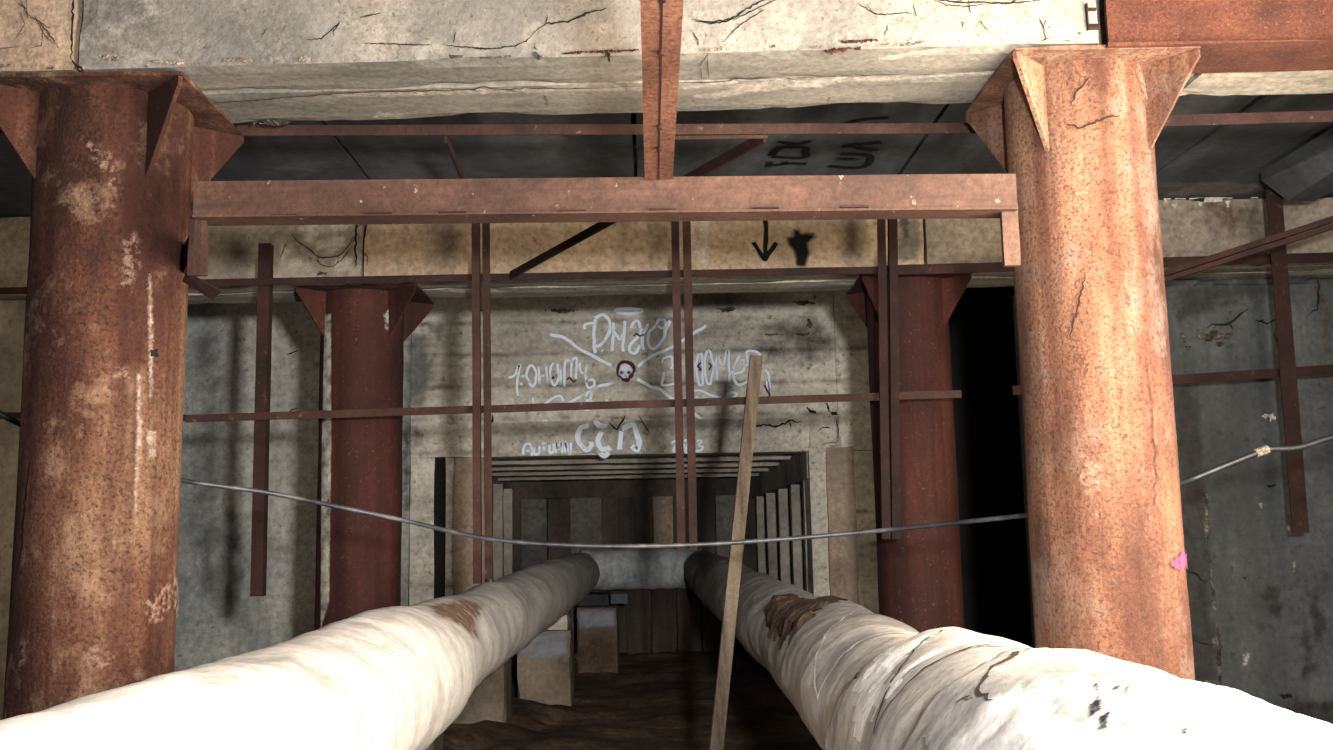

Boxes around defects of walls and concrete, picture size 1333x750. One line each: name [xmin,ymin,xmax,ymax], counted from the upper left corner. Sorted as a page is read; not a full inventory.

crack [686,0,901,83]
crack [1207,309,1277,343]